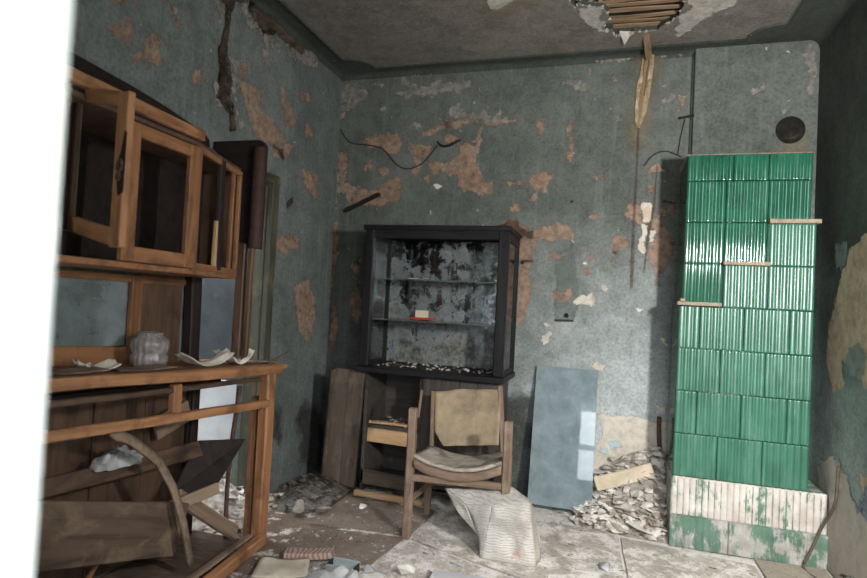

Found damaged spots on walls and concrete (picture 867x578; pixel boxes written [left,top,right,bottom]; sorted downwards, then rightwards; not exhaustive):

crack [212,0,319,133]
peeling [240,62,314,161]
peeling [487,0,514,10]
peeling [578,6,606,32]
spalling [635,34,688,128]
peeling [674,0,737,37]
peeling [327,74,517,355]
peeling [624,163,677,286]
peeling [553,283,608,307]
peeling [826,233,867,395]
flaking render [593,403,668,476]
flaking render [817,455,867,578]